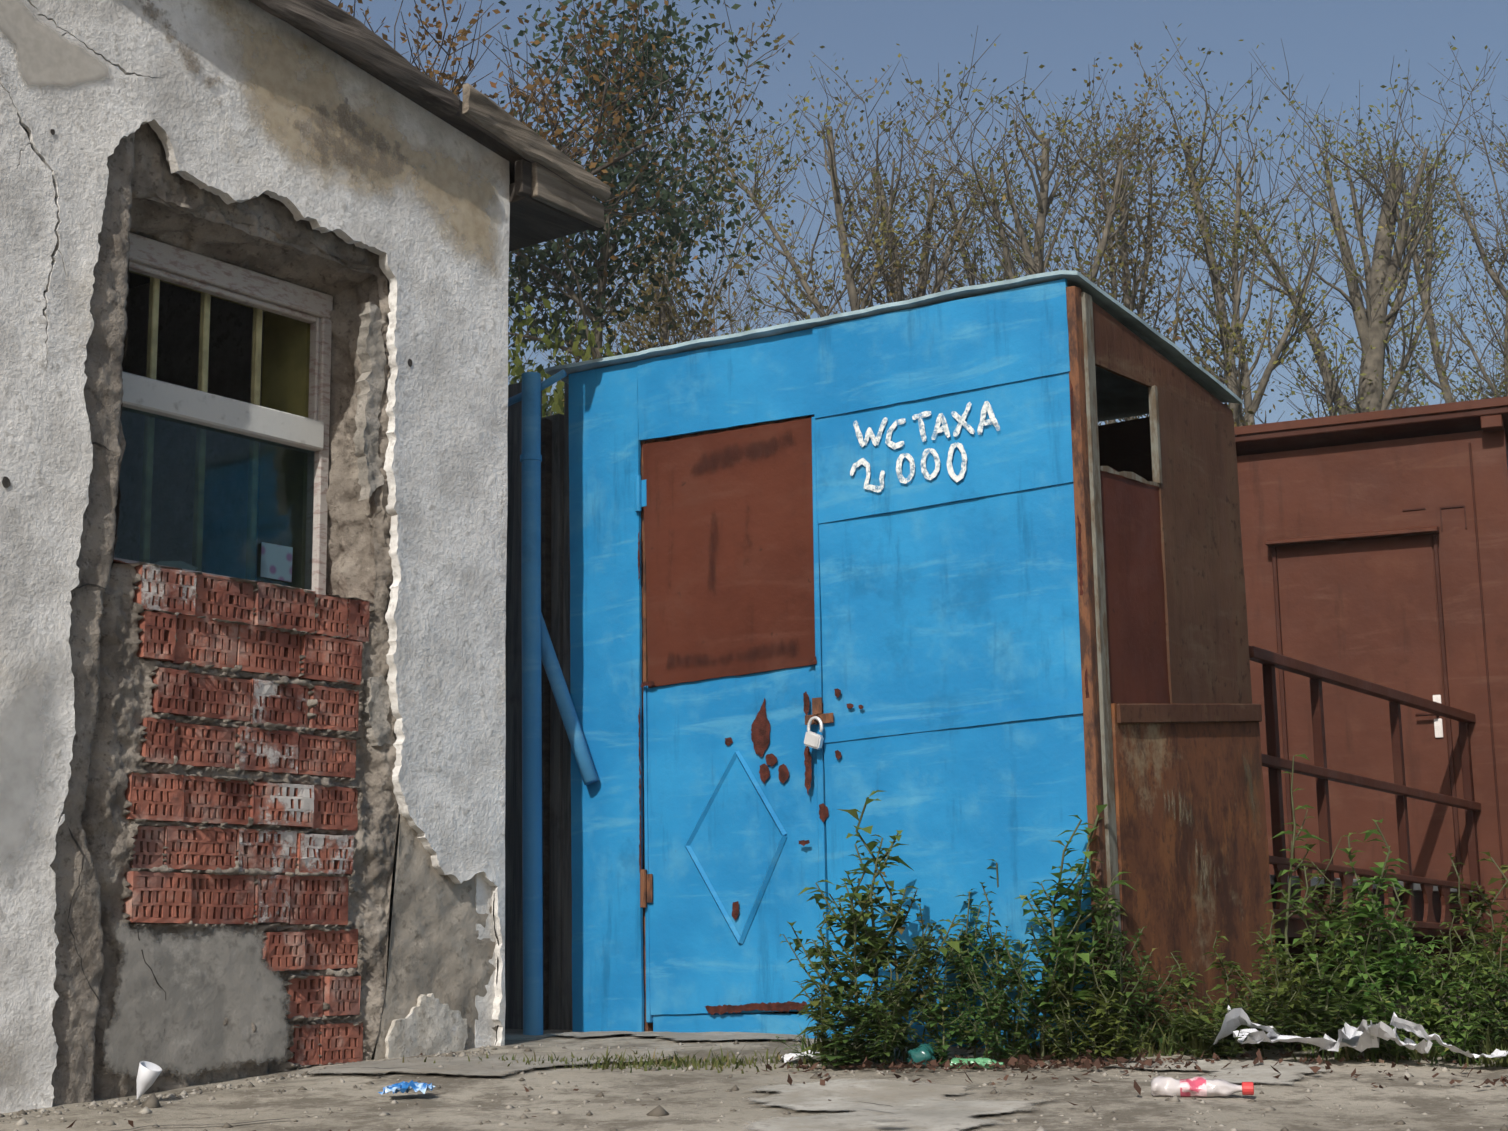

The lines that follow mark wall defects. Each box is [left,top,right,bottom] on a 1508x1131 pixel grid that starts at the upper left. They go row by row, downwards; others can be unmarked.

damp [221,5,494,259]
flaking render [50,123,496,1106]
rust [751,697,829,822]
rust [803,688,863,715]